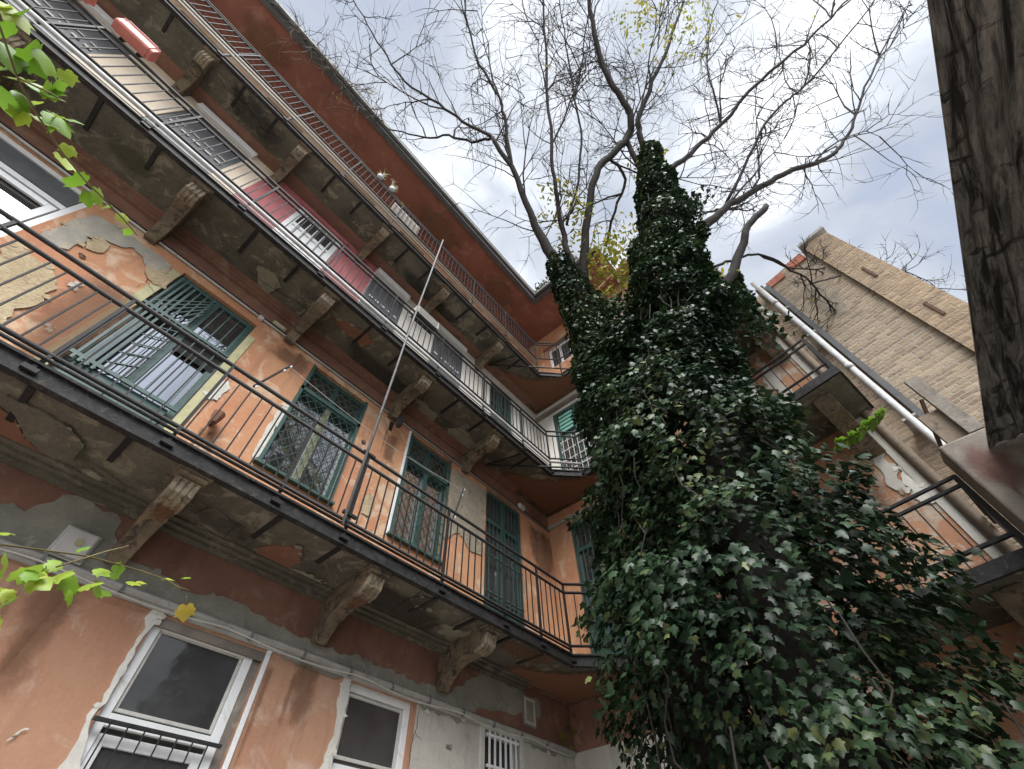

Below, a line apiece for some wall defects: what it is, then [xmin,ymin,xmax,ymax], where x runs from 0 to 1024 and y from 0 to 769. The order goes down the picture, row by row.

flaking render [0,241,84,324]
flaking render [0,408,51,458]
flaking render [872,453,936,504]
flaking render [256,544,327,584]
peeling [281,655,344,686]